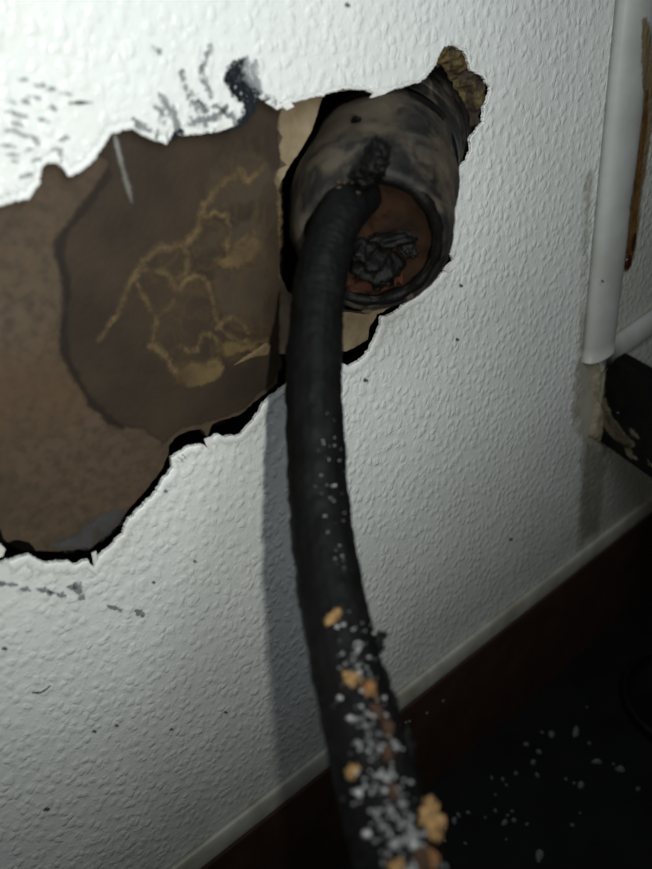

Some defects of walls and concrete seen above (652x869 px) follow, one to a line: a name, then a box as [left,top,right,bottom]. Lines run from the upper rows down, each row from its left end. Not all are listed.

peeling [368,88,391,98]
peeling [265,98,294,110]
peeling [214,117,233,132]
peeling [443,259,457,273]